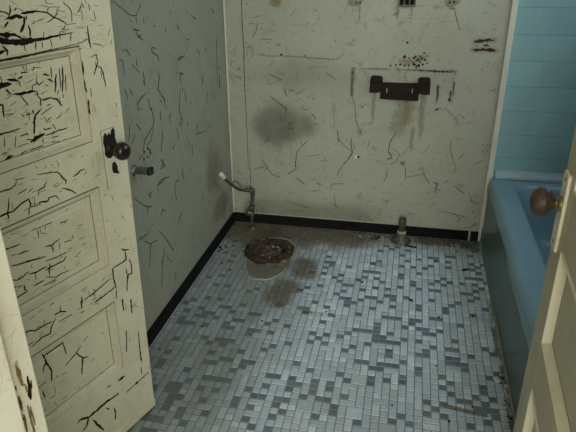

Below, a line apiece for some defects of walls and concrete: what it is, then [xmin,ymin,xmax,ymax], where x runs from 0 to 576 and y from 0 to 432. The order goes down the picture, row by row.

crack [113,1,217,216]
crack [241,0,262,153]
crack [260,53,343,112]
crack [250,94,374,208]
crack [376,130,478,228]
water stain [247,256,291,278]